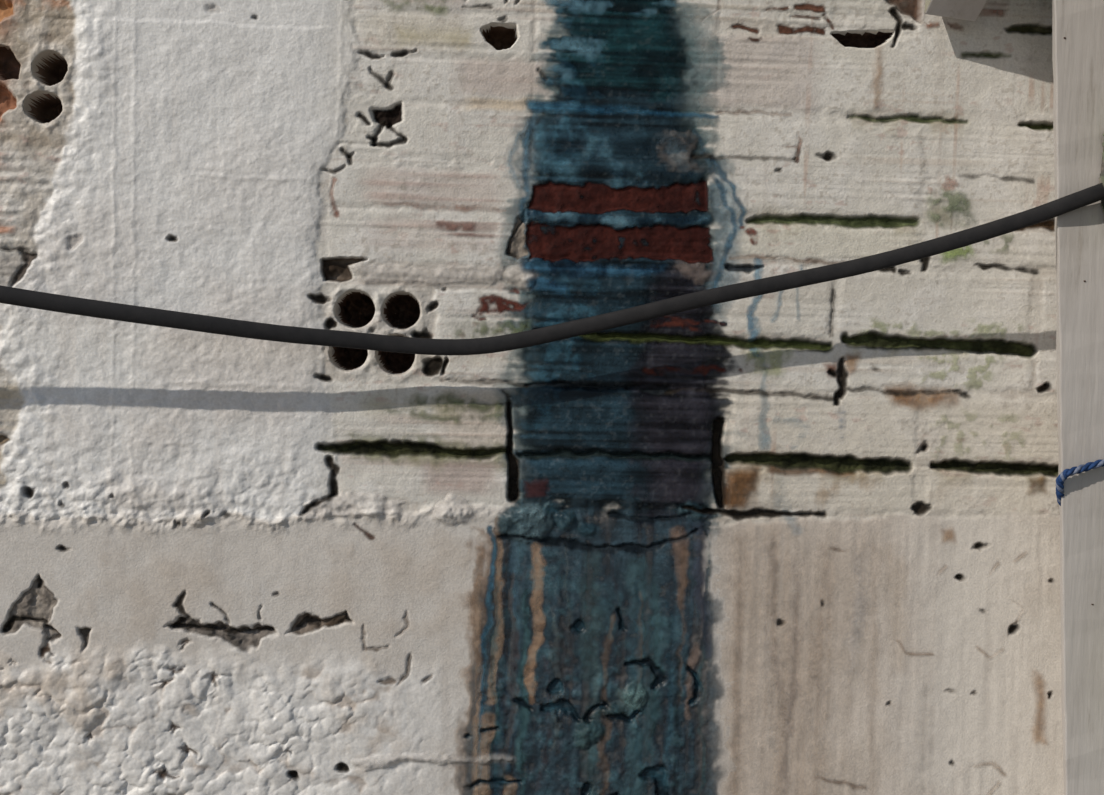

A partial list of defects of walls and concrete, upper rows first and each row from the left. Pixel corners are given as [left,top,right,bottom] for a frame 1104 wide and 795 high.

spalling [28,53,68,123]
crack [360,51,409,90]
crack [326,148,353,173]
leakage [507,0,745,332]
peeling [507,181,713,263]
leakage [747,295,762,357]
crack [300,290,1059,553]
leakage [463,305,729,795]
spalling [2,576,61,640]
spalling [79,628,91,647]
spalling [168,592,275,650]
spalling [291,612,350,634]